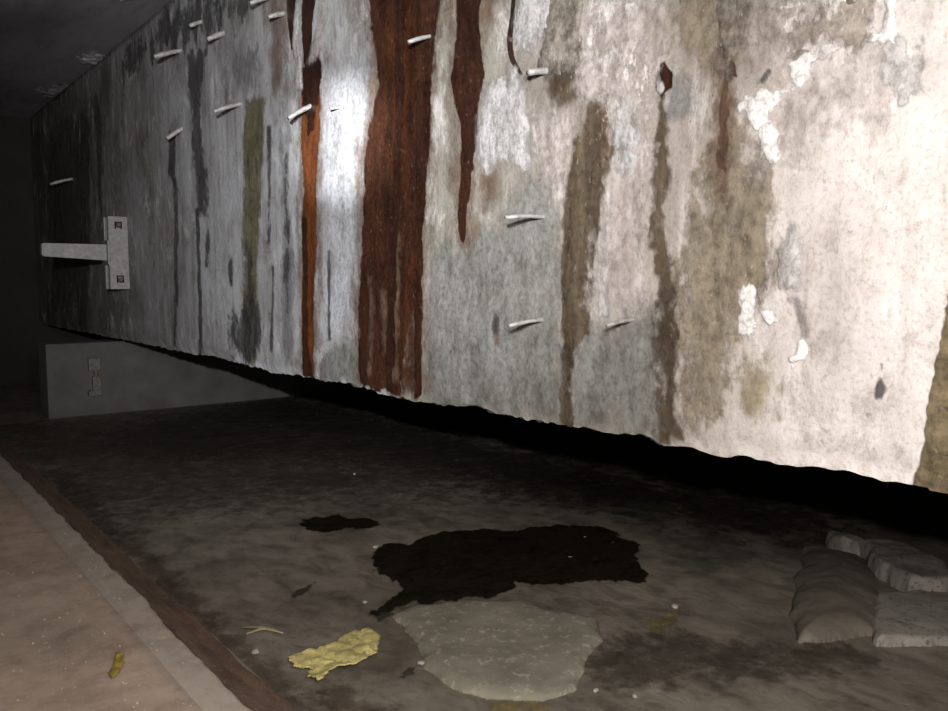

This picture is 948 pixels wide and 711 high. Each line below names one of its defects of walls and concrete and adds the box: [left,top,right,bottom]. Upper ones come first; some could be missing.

leakage [121,0,254,355]
leakage [228,98,292,365]
rust [271,0,322,378]
rust [352,0,440,398]
rust [449,0,493,247]
rust [507,0,522,75]
leakage [475,0,684,445]